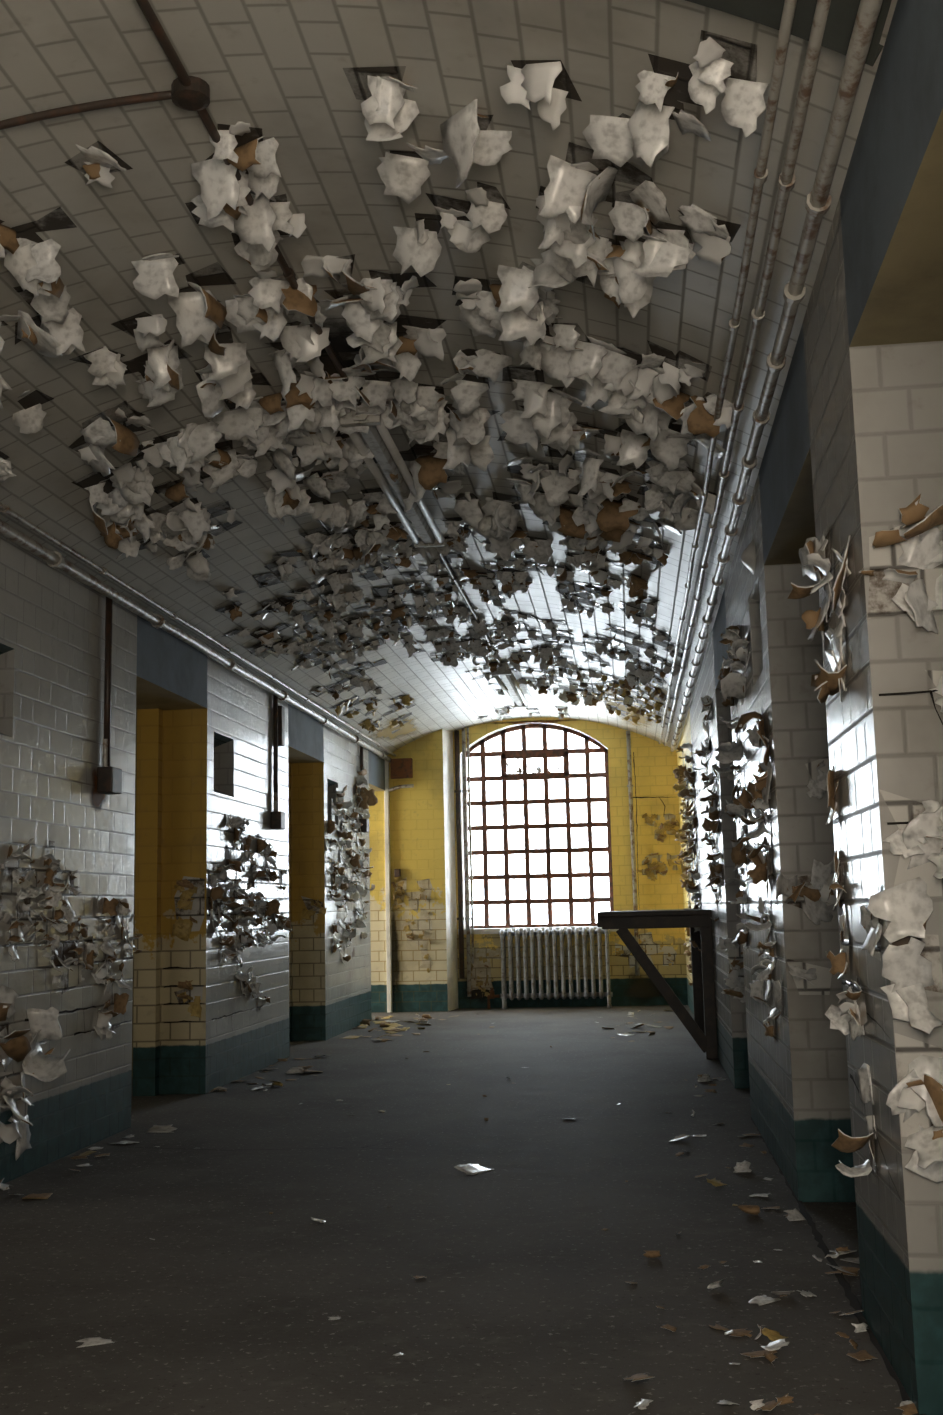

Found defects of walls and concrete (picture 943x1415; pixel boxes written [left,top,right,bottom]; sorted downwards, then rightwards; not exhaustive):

peeling [0,30,769,734]
peeling [787,494,943,703]
peeling [0,838,143,1160]
peeling [172,753,433,1010]
peeling [615,625,943,1184]